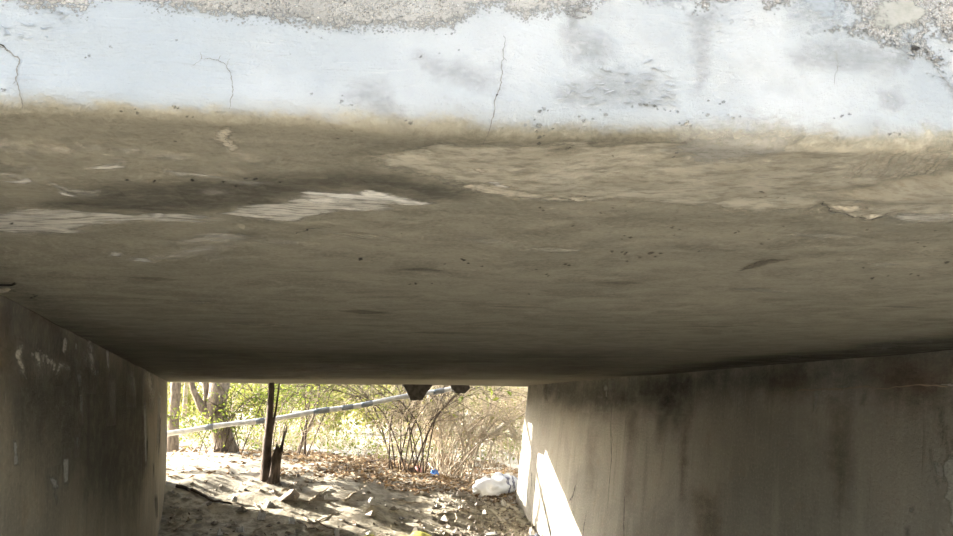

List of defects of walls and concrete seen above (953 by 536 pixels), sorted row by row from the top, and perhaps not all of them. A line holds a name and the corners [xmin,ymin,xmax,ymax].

flaking render [0,0,95,38]
flaking render [140,0,597,34]
flaking render [762,0,791,11]
flaking render [824,0,953,78]
crack [0,44,23,109]
crack [194,53,234,109]
crack [483,35,506,144]